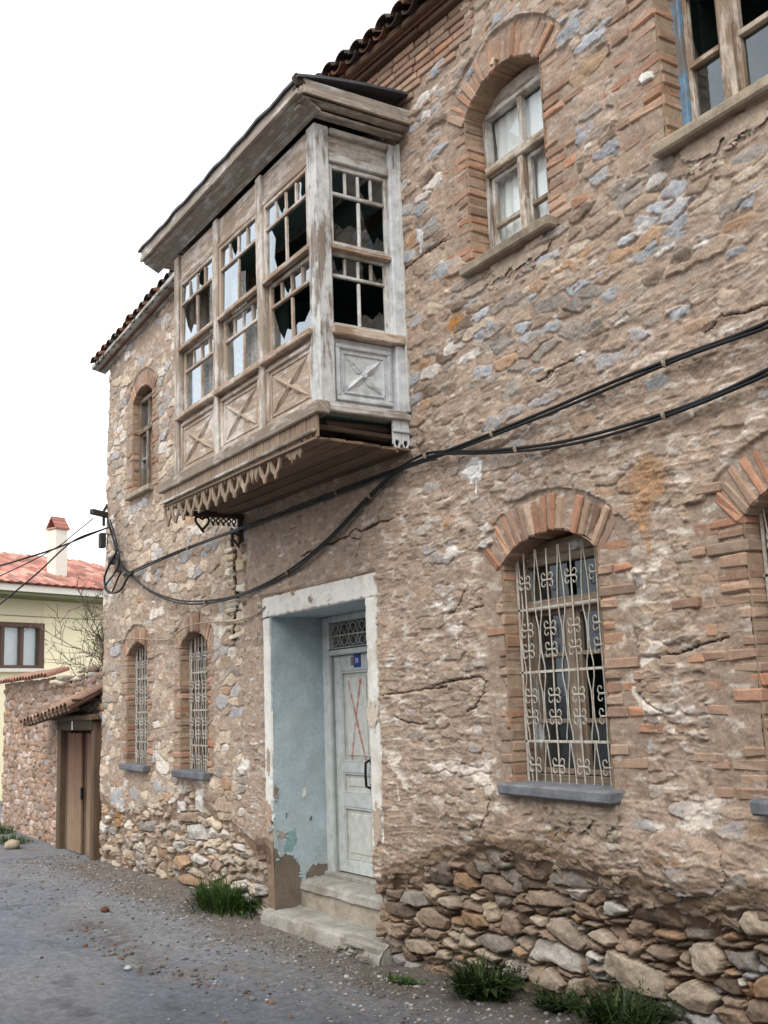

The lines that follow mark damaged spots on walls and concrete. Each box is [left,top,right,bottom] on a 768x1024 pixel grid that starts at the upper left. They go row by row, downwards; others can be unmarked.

crack [302,519,392,557]
crack [383,676,487,725]
spalling [265,748,328,910]